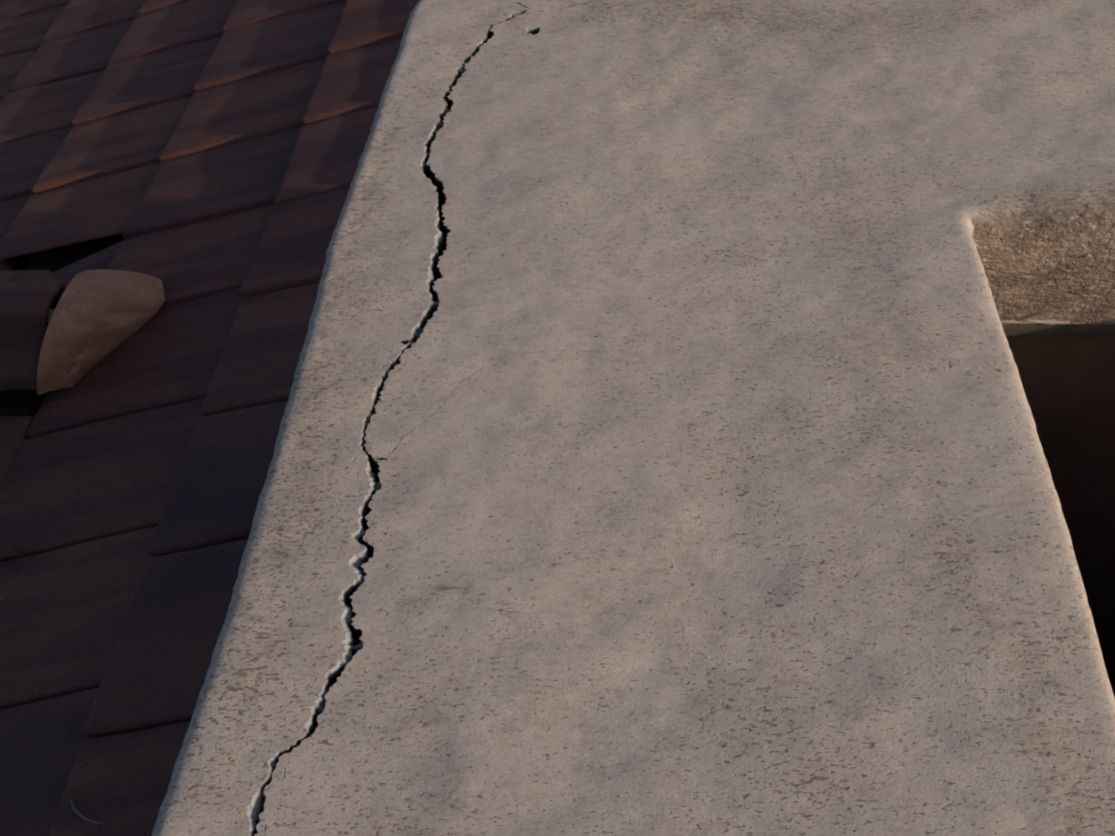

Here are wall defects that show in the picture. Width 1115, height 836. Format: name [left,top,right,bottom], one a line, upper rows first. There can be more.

crack [247,3,615,836]